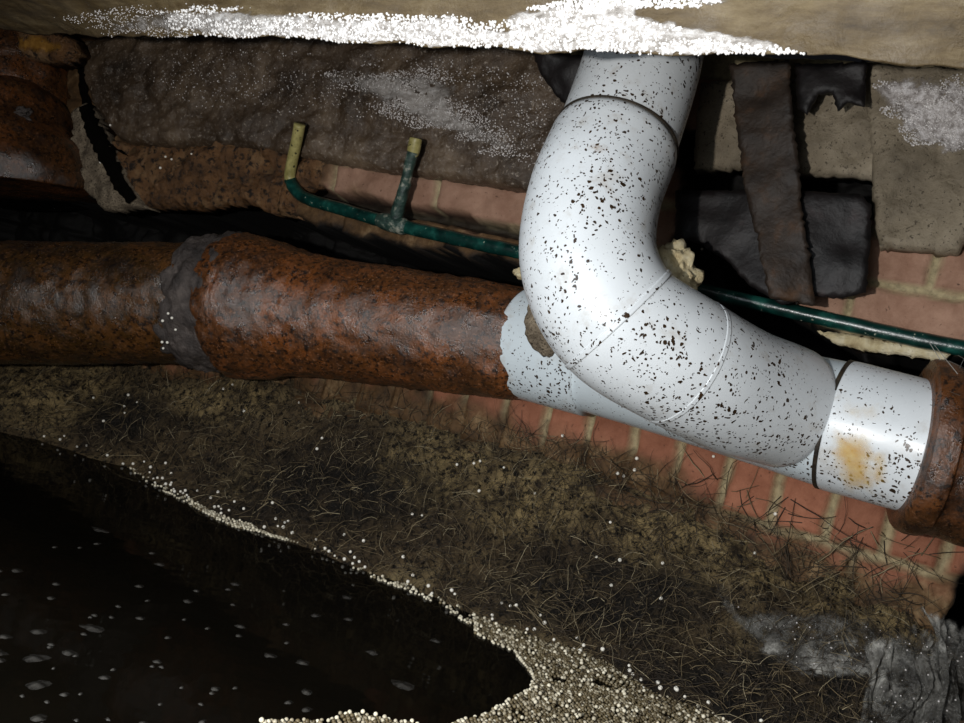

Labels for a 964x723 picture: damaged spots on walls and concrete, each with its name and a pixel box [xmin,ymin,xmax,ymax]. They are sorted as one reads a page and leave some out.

crack [77,67,137,204]
leakage [54,0,806,167]
leakage [872,73,964,151]